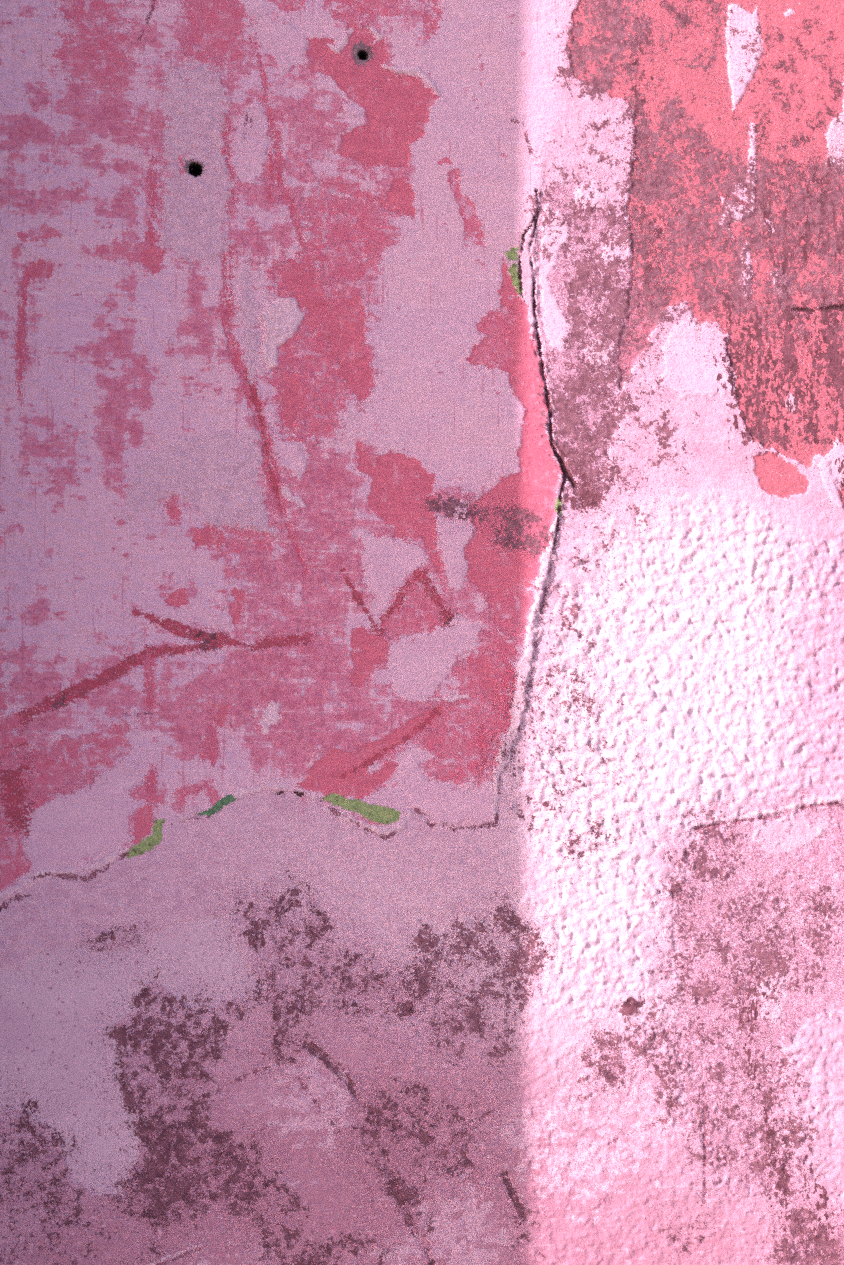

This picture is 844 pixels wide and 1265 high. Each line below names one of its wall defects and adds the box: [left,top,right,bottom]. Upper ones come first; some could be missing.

peeling [566,0,844,512]
crack [793,302,844,314]
crack [0,851,134,911]
flaking render [0,0,572,1198]
water stain [0,861,574,1265]
water stain [412,0,844,1265]